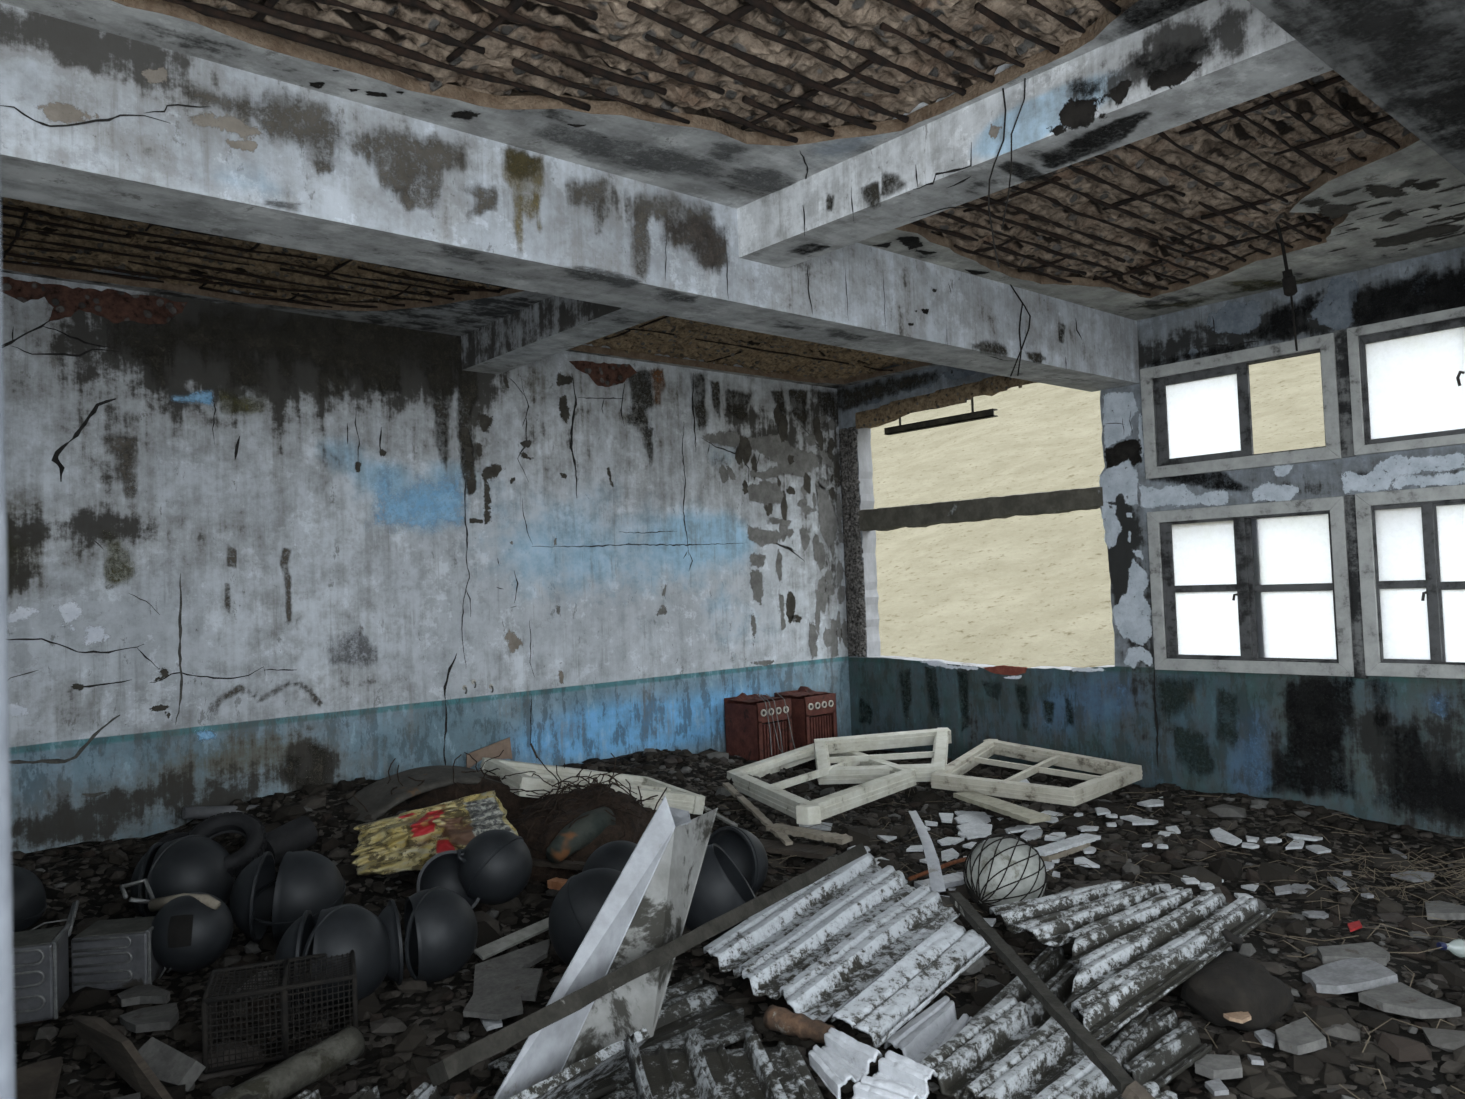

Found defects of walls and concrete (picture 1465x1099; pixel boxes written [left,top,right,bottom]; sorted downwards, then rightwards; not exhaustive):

spalling [163,0,1121,143]
spalling [872,61,1465,296]
spalling [0,197,508,324]
crack [51,398,116,482]
leakage [113,306,478,494]
leakage [628,370,654,460]
leakage [694,374,751,428]
crack [990,322,1087,381]
leakage [280,548,292,622]
peeling [703,405,867,667]
flaking render [1098,390,1229,669]
crack [8,573,292,797]